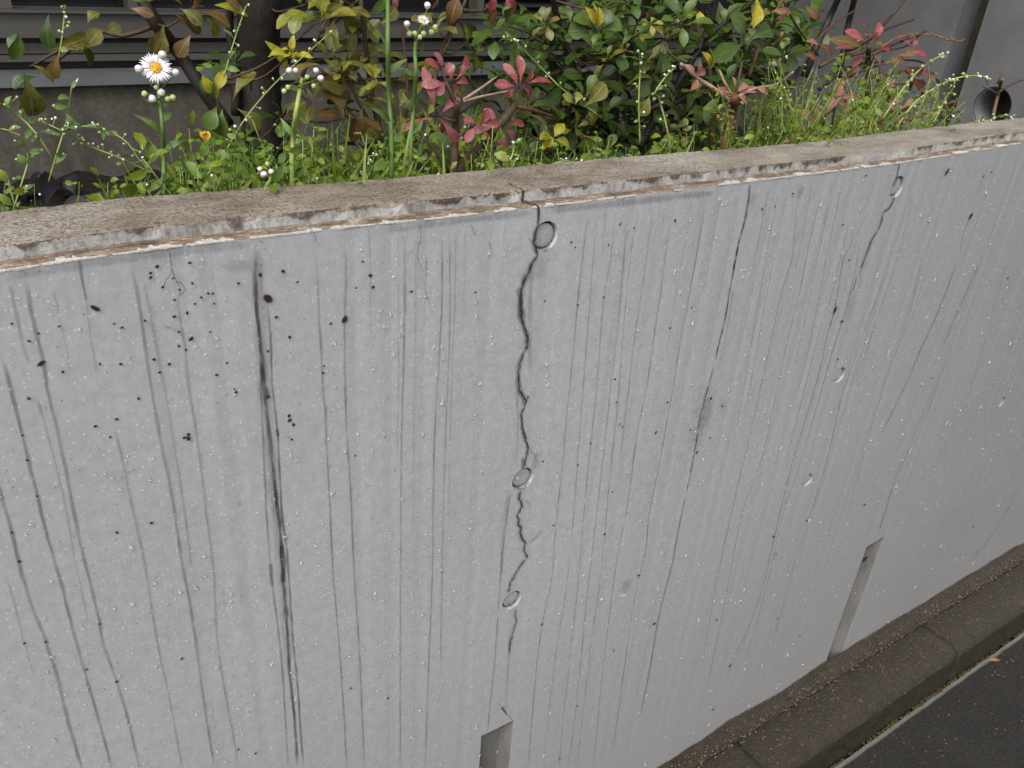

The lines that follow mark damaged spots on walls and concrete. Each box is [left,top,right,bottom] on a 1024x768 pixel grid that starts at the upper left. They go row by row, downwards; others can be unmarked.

water stain [255,283,268,396]
water stain [272,465,280,528]
crack [498,183,540,722]
water stain [286,608,300,728]